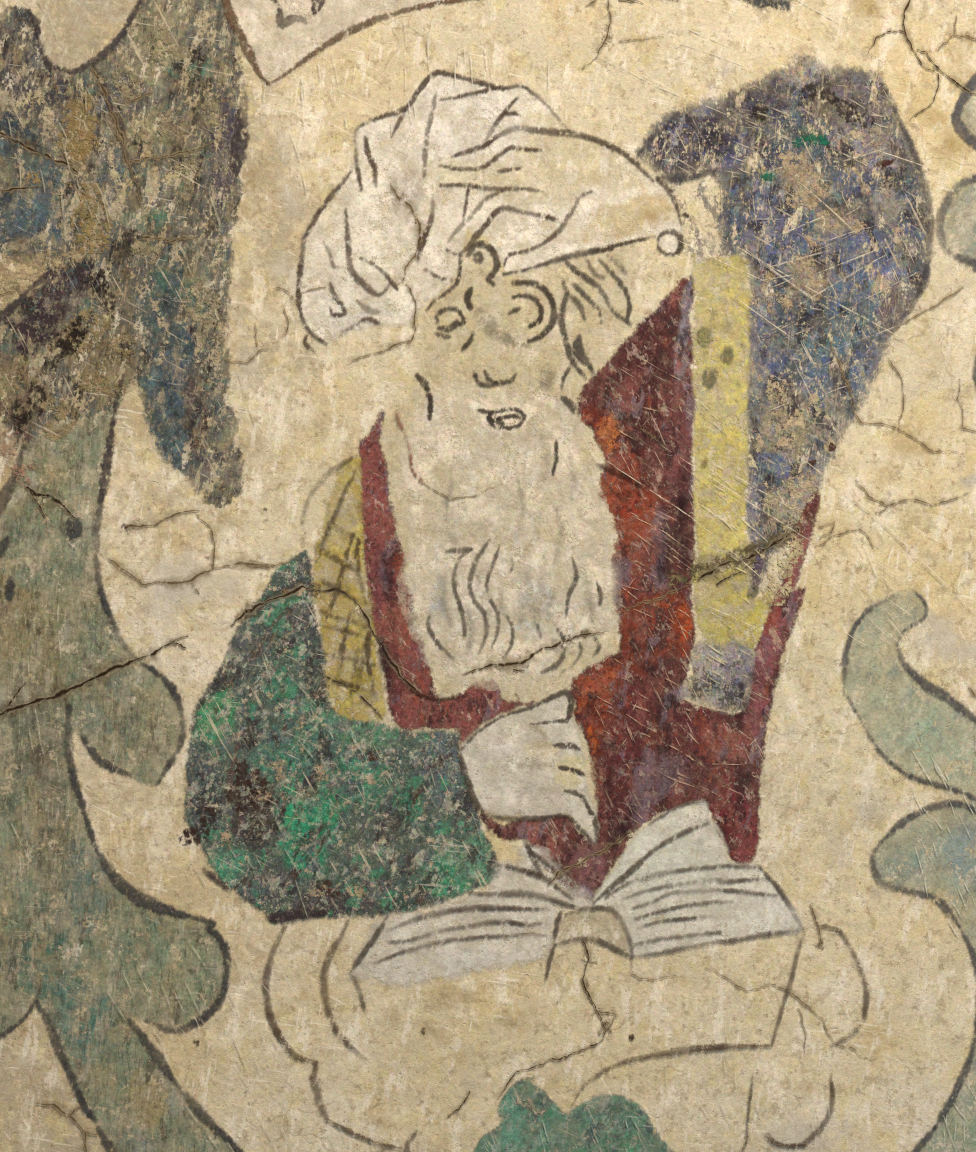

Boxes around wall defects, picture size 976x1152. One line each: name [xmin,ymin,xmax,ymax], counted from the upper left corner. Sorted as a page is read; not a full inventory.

crack [868,0,976,118]
crack [831,341,976,454]
crack [96,484,971,700]
crack [0,636,188,717]
crack [325,676,383,719]
crack [498,938,617,1098]
crack [707,968,860,1056]